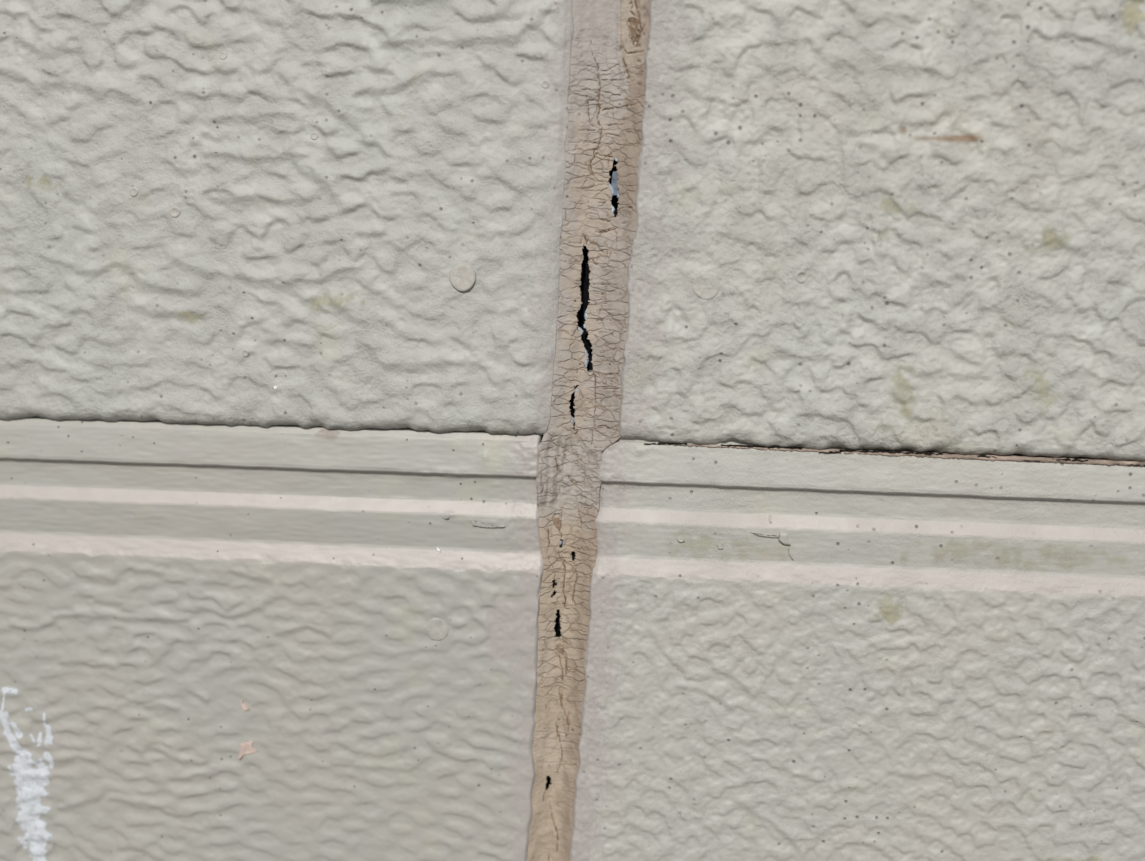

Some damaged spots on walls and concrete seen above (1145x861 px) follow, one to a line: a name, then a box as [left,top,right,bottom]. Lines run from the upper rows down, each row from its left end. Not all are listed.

water stain [8,707,55,861]
crack [543,0,646,858]